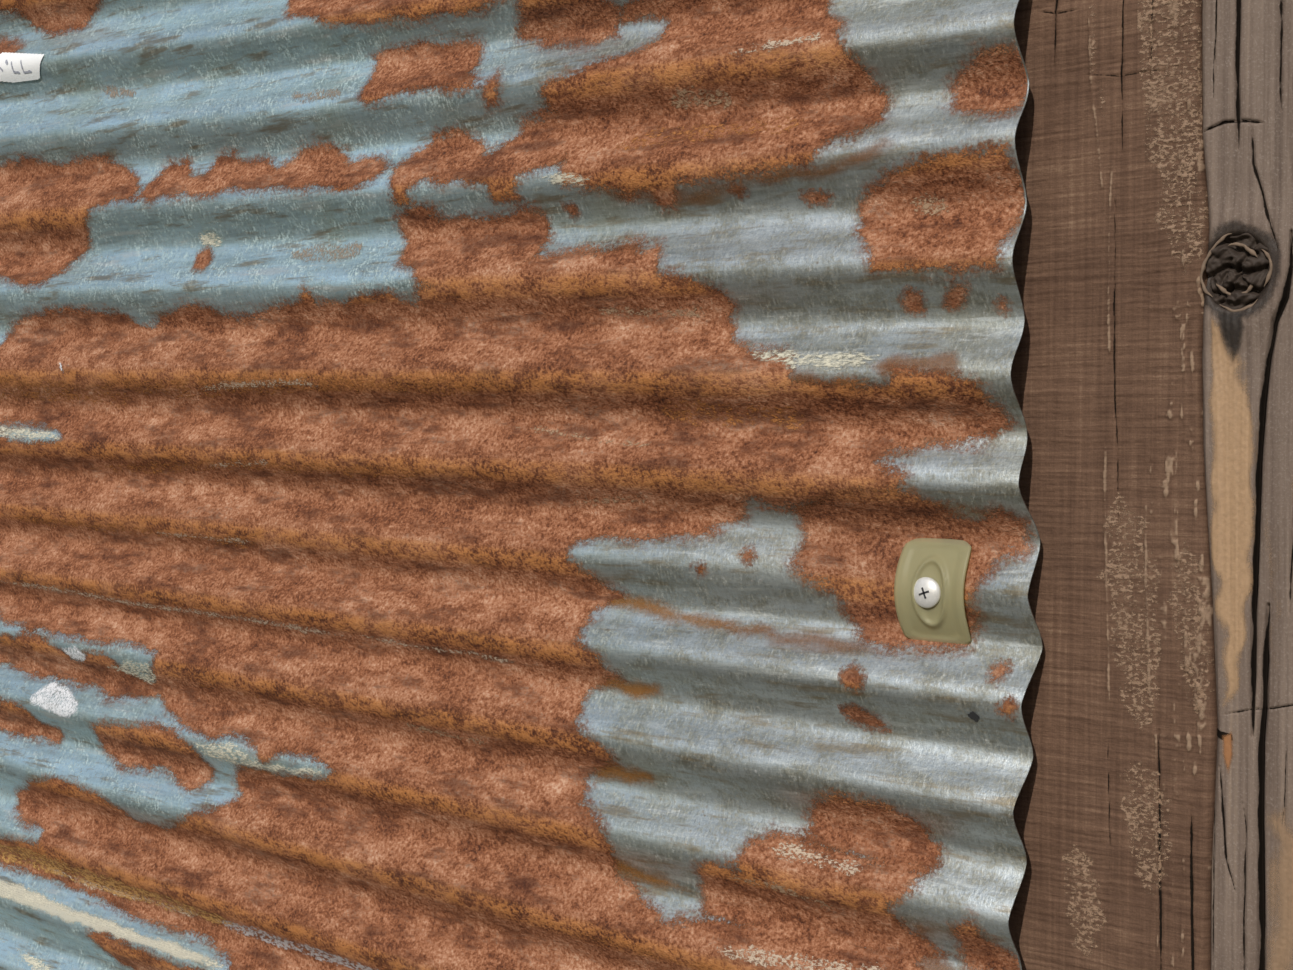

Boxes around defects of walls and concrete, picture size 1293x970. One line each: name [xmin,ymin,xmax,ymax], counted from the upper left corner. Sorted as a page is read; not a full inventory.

corrosion [0,37,26,54]
corrosion [0,0,104,38]
corrosion [292,87,341,103]
corrosion [285,0,504,28]
corrosion [356,35,501,110]
corrosion [514,0,893,211]
corrosion [948,43,1028,119]
crack [1158,0,1293,970]
corrosion [0,107,1036,970]